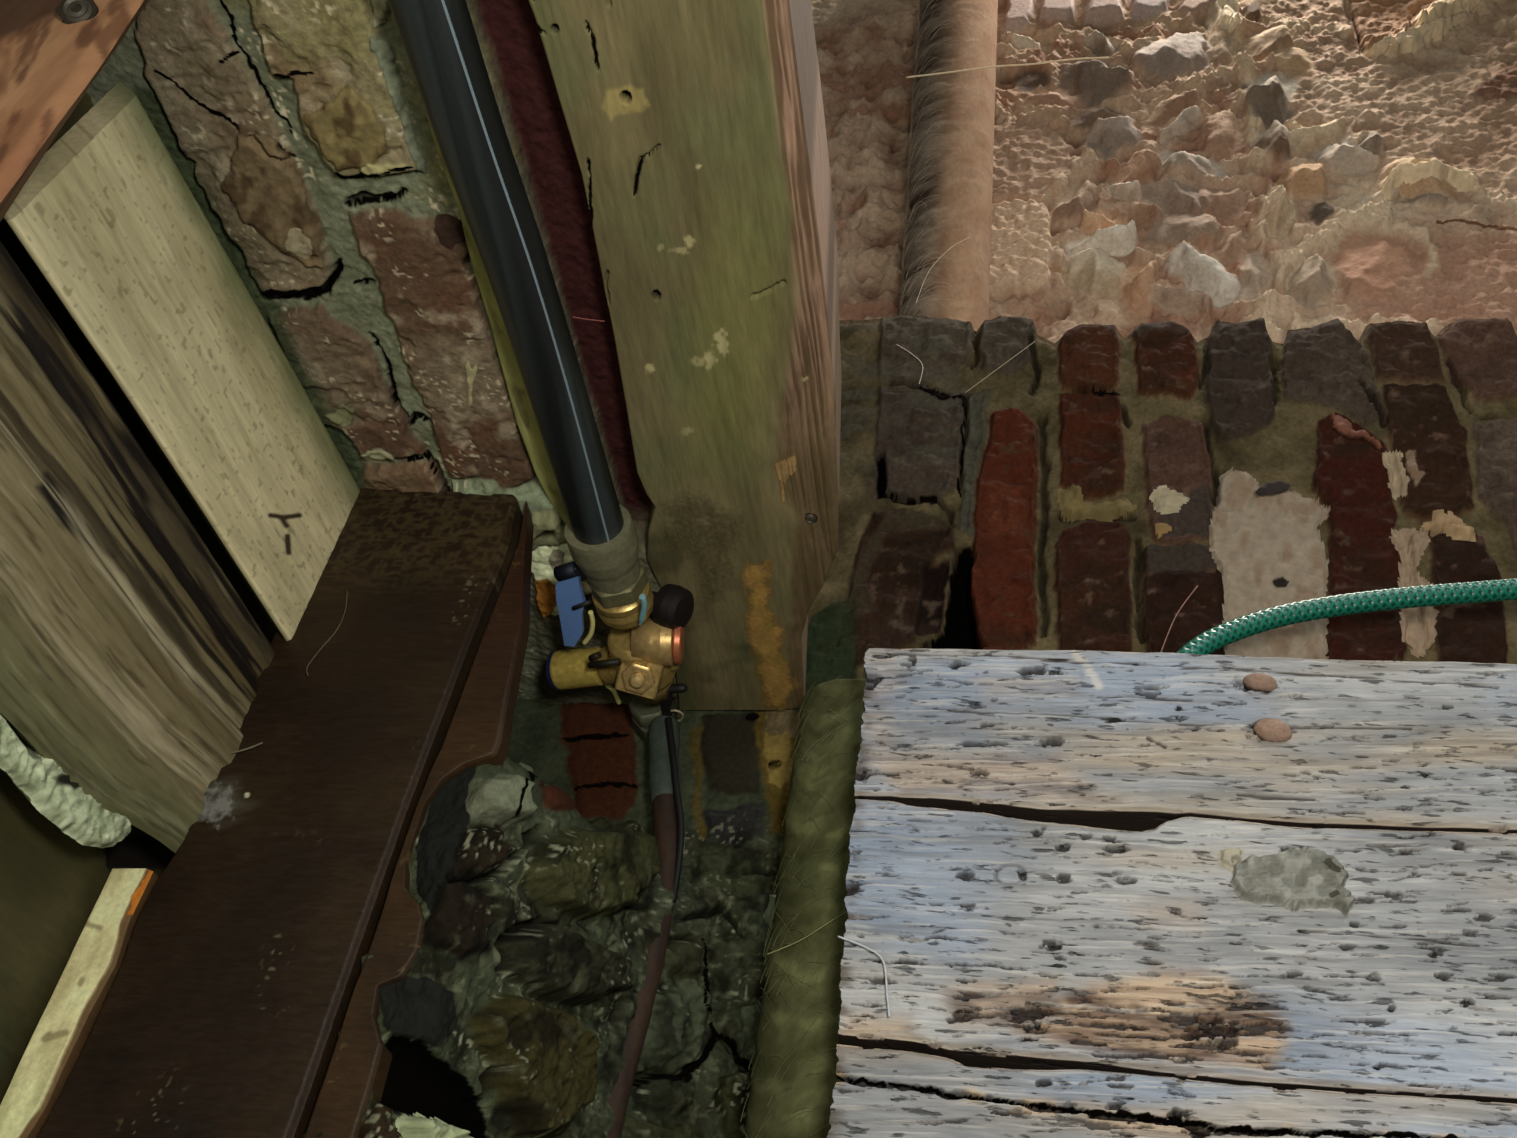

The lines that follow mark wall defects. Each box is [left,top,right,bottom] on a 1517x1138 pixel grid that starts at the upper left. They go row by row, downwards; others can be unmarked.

crack [154,70,239,130]
crack [219,0,314,157]
crack [334,166,413,179]
crack [328,258,344,286]
crack [372,333,438,474]
spalling [1255,480,1290,496]
peeling [1405,450,1425,486]
peeling [1389,509,1477,587]
peeling [1399,606,1440,658]